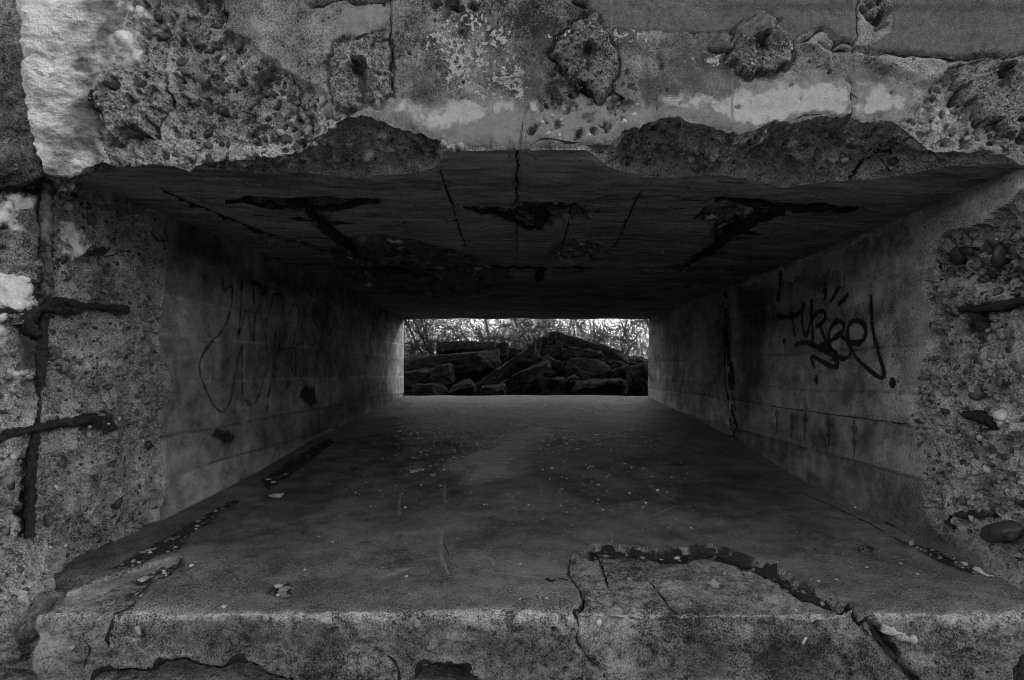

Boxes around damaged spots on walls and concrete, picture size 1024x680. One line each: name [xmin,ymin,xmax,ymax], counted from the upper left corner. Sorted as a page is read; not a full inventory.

spalling [95,0,1024,188]
crack [440,171,467,246]
crack [515,107,581,259]
crack [560,194,639,253]
spalling [696,205,783,243]
corrosion [0,183,130,539]
spalling [0,0,182,680]
crack [721,290,739,441]
corrosion [958,297,1024,352]
spalling [568,544,870,638]
crack [546,544,920,680]